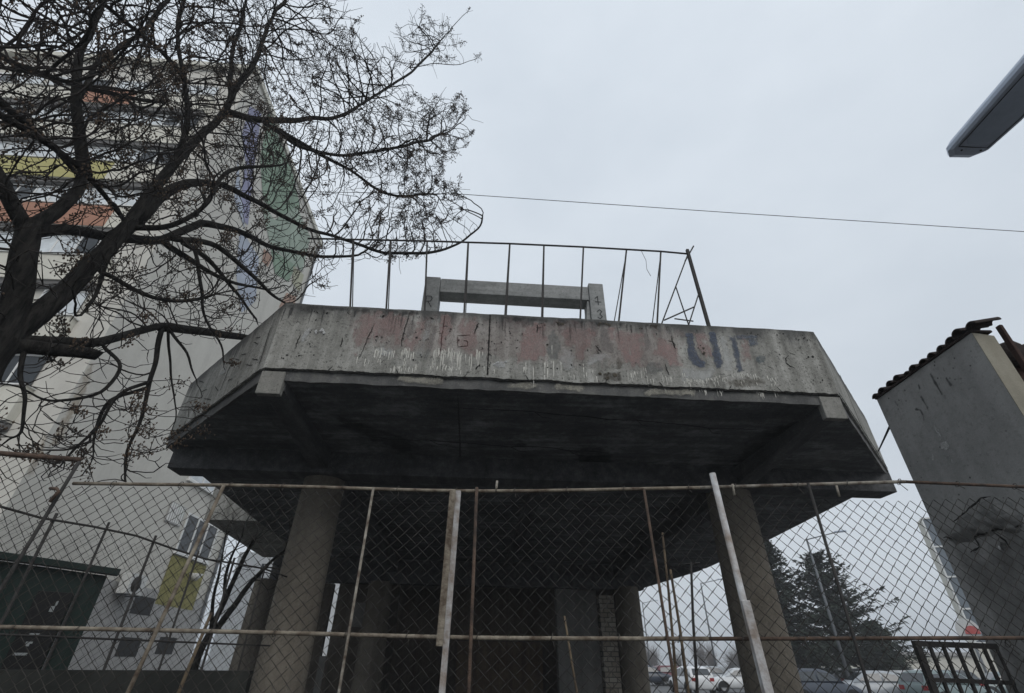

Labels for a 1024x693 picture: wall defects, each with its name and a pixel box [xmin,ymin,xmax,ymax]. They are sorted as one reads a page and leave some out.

crack [169,314,888,469]
crack [943,496,1019,552]